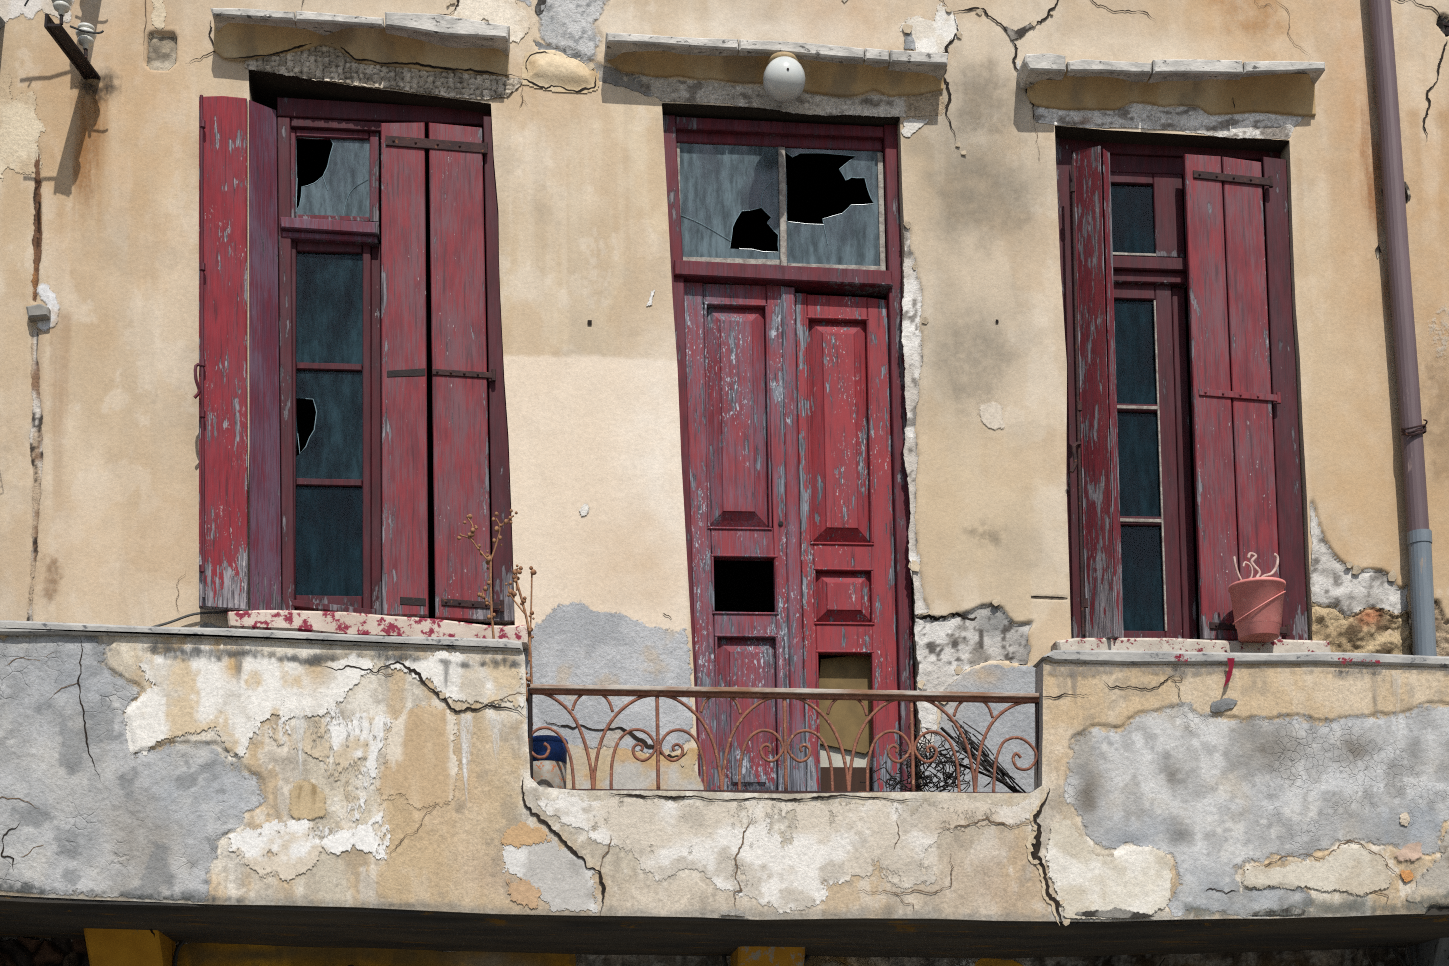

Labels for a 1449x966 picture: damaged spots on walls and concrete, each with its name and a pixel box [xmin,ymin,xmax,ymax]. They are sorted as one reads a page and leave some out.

crack [186,21,596,108]
crack [440,0,459,15]
spalling [453,0,653,97]
crack [943,0,1058,161]
crack [1092,0,1152,18]
crack [1398,0,1447,135]
spalling [901,221,1032,751]
spalling [1310,502,1409,617]
peeling [124,643,525,882]
crack [316,661,1070,926]
peeling [535,744,1172,919]
peeling [1242,829,1449,916]